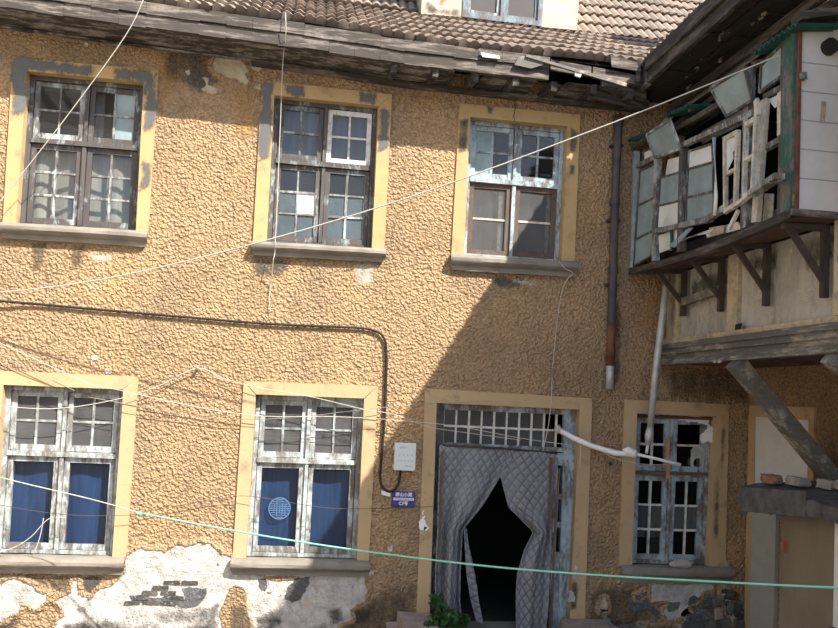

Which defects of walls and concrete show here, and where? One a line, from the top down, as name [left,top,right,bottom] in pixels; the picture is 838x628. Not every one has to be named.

peeling [201,57,261,94]
peeling [0,536,374,628]
peeling [593,592,612,617]
peeling [628,583,745,628]